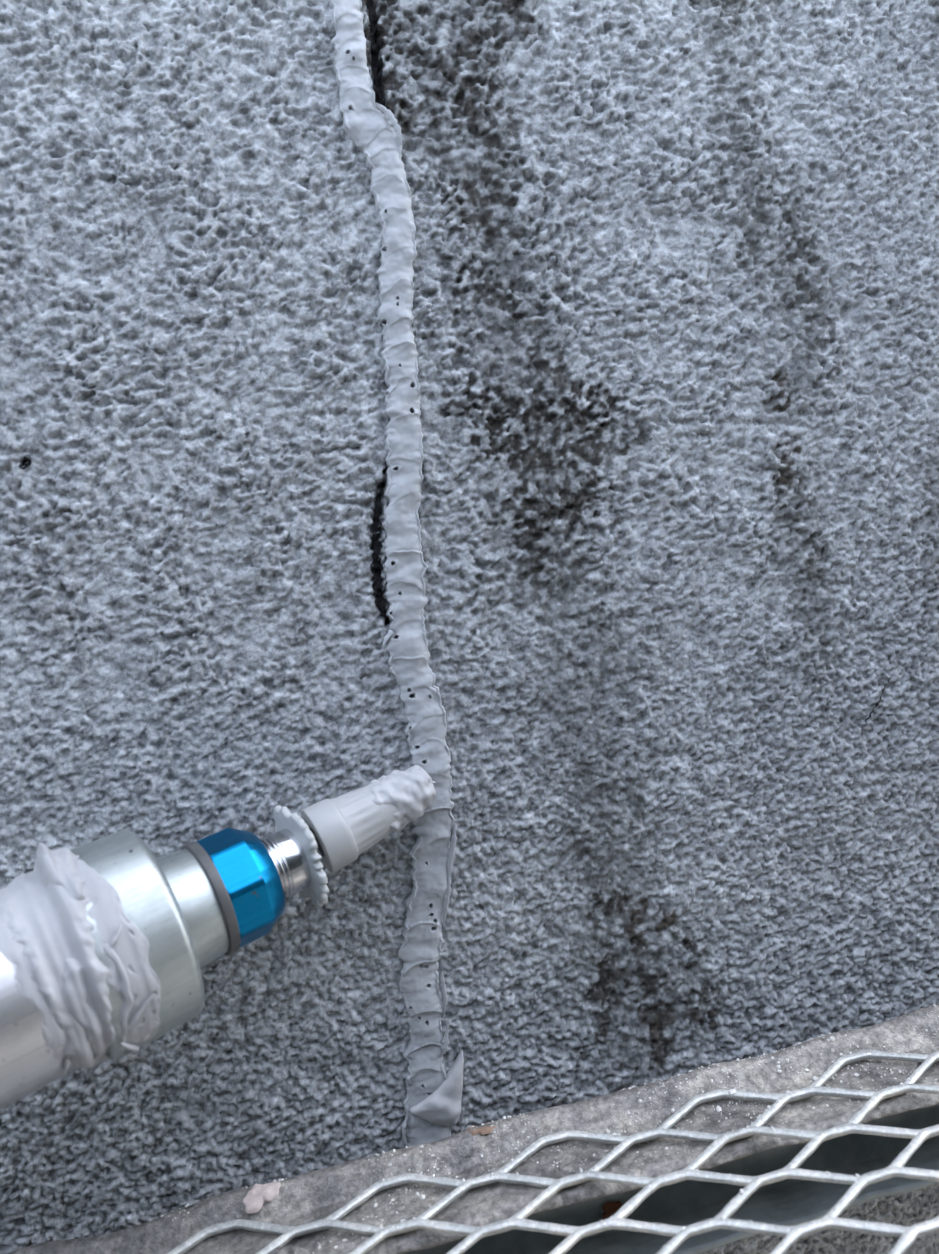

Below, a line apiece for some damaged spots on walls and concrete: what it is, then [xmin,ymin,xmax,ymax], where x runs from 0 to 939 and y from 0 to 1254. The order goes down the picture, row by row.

crack [367,0,385,110]
damp [361,0,412,134]
damp [434,0,542,239]
damp [456,269,523,321]
damp [442,333,650,588]
crack [370,488,389,622]
damp [586,893,721,1065]